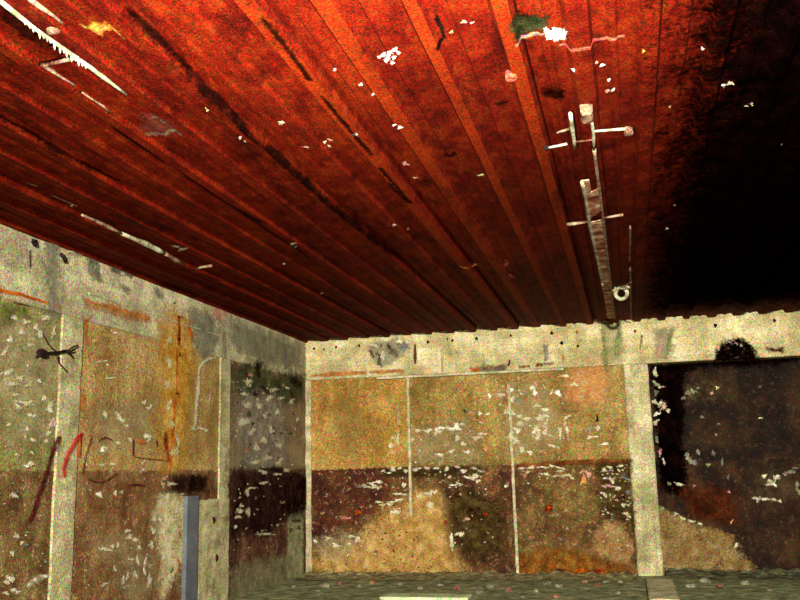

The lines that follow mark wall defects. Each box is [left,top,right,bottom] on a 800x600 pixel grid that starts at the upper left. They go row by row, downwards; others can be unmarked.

water stain [509,13,550,46]
water stain [560,35,625,52]
rust [155,302,197,474]
peeling [234,373,300,472]
peeling [652,367,670,425]
water stain [224,465,307,550]
flaking render [285,376,637,580]